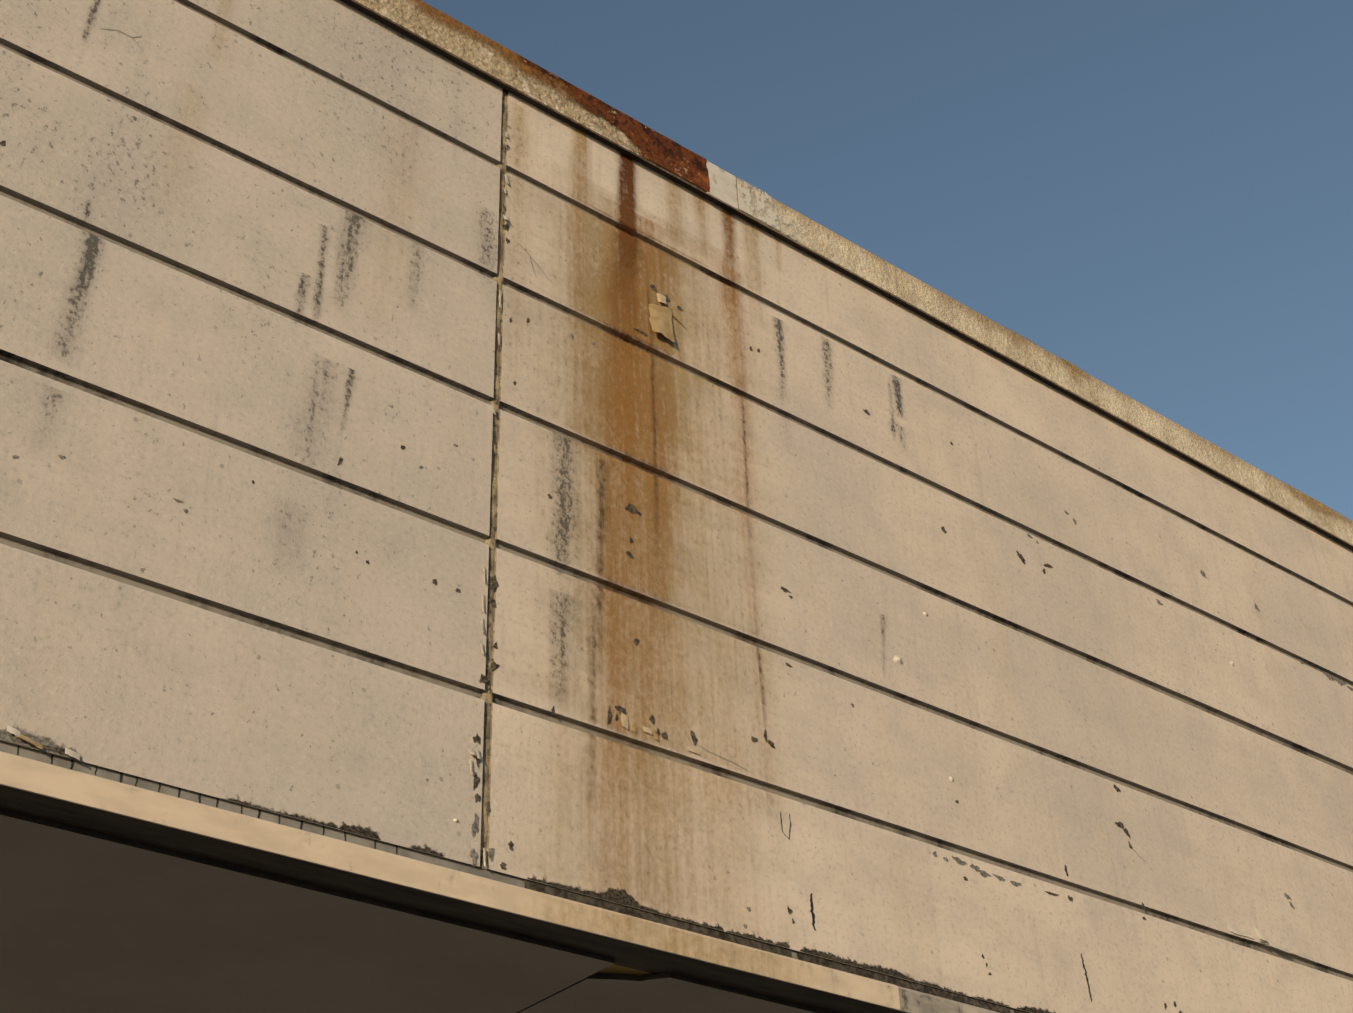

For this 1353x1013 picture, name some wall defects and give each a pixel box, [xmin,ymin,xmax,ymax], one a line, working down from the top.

water stain [60,233,102,355]
corrosion [419,0,710,614]
corrosion [723,209,735,312]
spalling [468,734,514,870]
peeling [607,706,668,741]
peeling [687,730,701,755]
peeling [933,851,1021,886]
spalling [524,877,1056,1013]